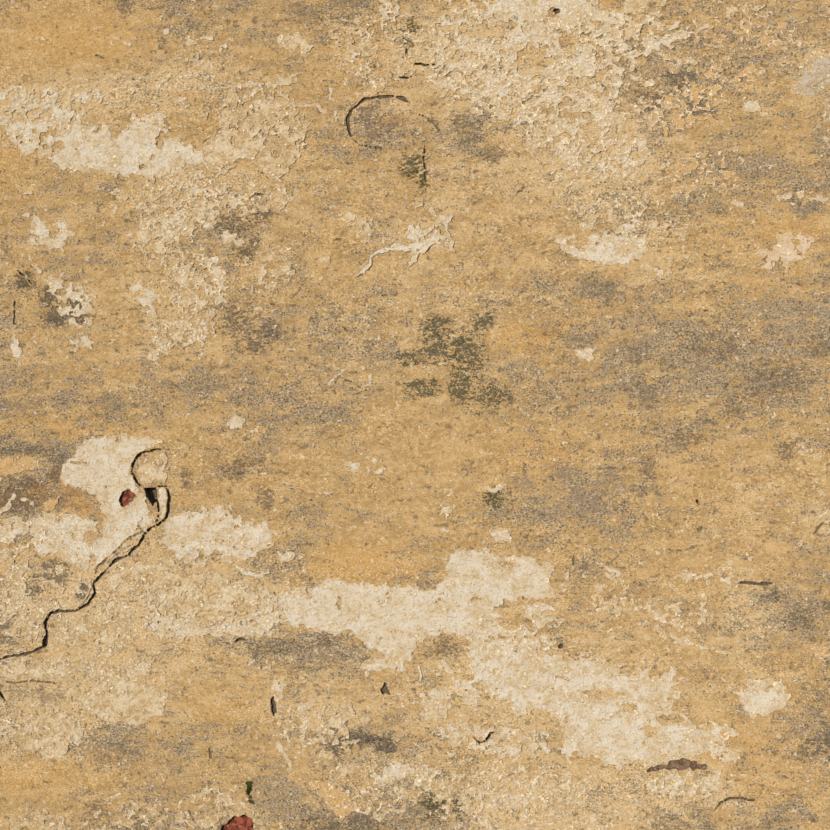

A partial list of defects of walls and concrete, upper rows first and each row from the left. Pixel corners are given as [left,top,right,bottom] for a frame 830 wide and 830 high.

crack [346,49,440,177]
peeling [0,0,802,362]
peeling [776,190,828,206]
peeling [756,232,814,274]
leakage [395,312,514,416]
crack [0,448,171,660]
peeling [0,433,753,830]
crack [0,679,56,701]
peeling [721,677,791,719]